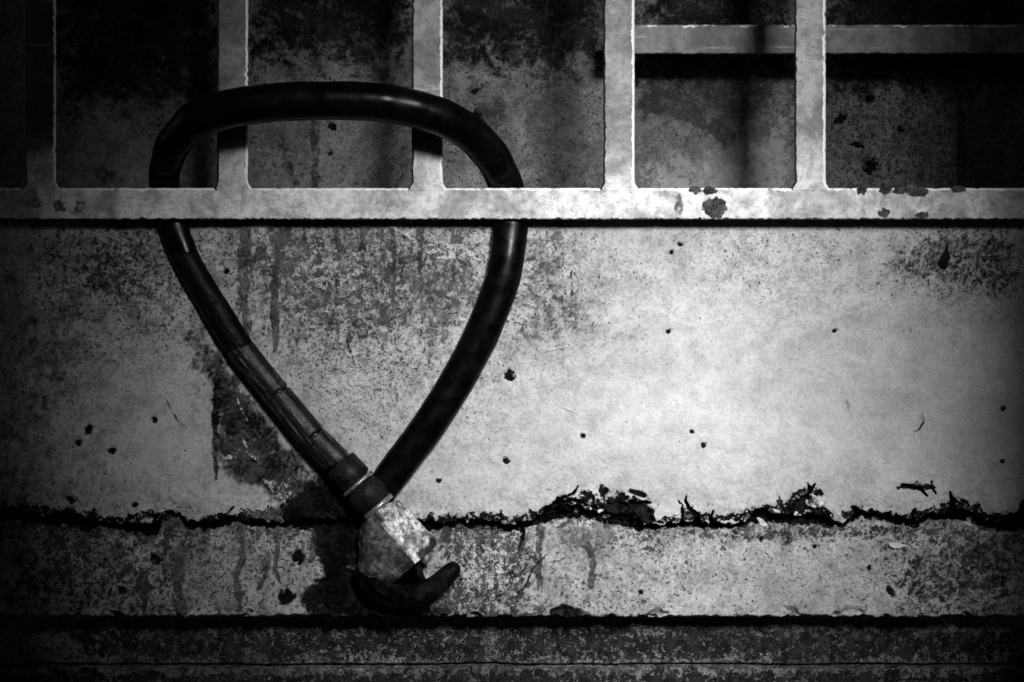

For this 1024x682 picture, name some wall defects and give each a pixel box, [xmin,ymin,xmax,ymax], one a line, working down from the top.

leakage [185,328,317,502]
crack [0,501,308,537]
crack [417,480,1024,592]
spalling [751,495,828,541]
spalling [951,507,1016,530]